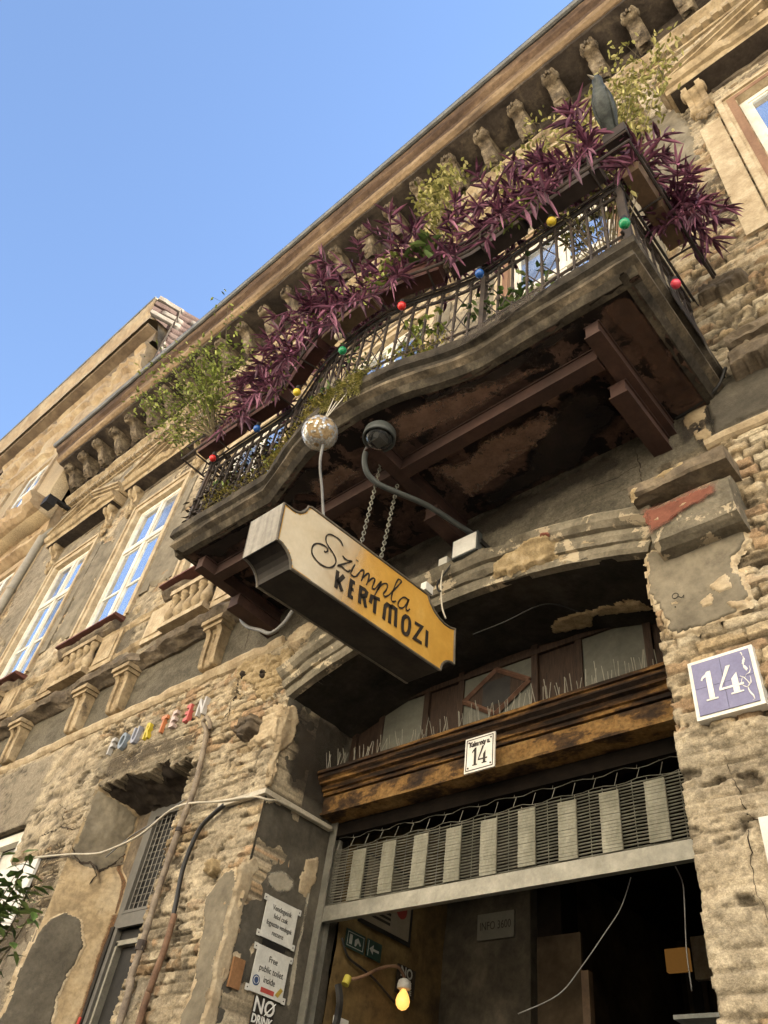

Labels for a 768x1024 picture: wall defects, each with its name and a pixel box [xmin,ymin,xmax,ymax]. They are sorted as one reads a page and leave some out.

spalling [683,405,712,441]
peeling [643,485,714,532]
peeling [492,532,558,579]
peeling [551,532,755,640]
crack [741,665,755,700]
crack [723,754,768,920]
peeling [298,857,319,897]
peeling [180,857,259,1024]
spalling [0,912,87,1024]